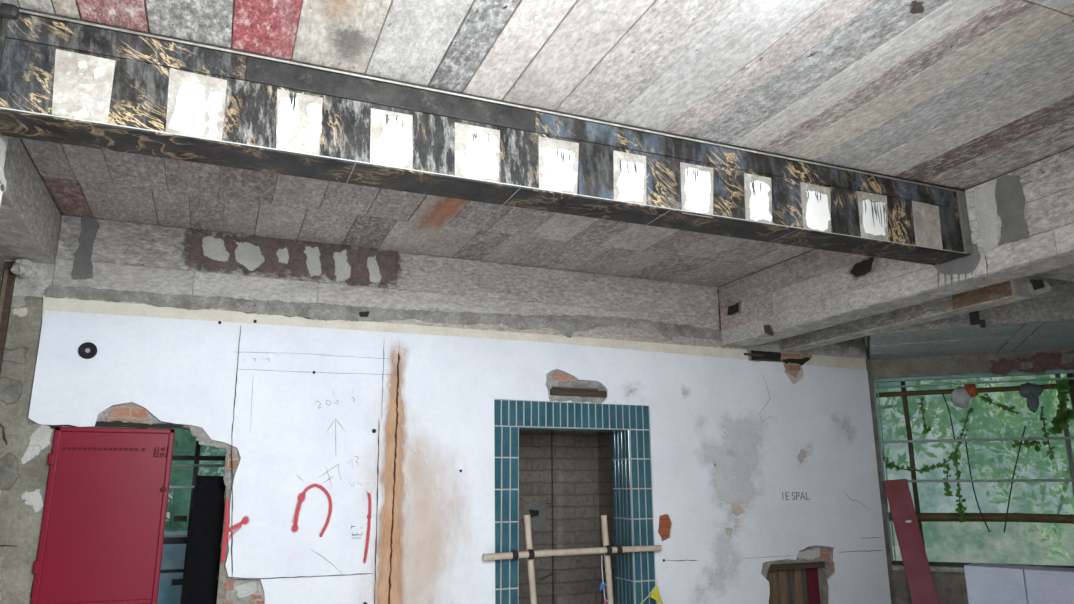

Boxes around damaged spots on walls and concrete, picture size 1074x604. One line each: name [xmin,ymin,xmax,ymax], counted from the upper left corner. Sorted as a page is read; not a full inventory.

spalling [747,350,812,384]
spalling [545,370,606,403]
spalling [94,402,241,490]
corrosion [376,350,441,604]
spalling [223,578,264,604]